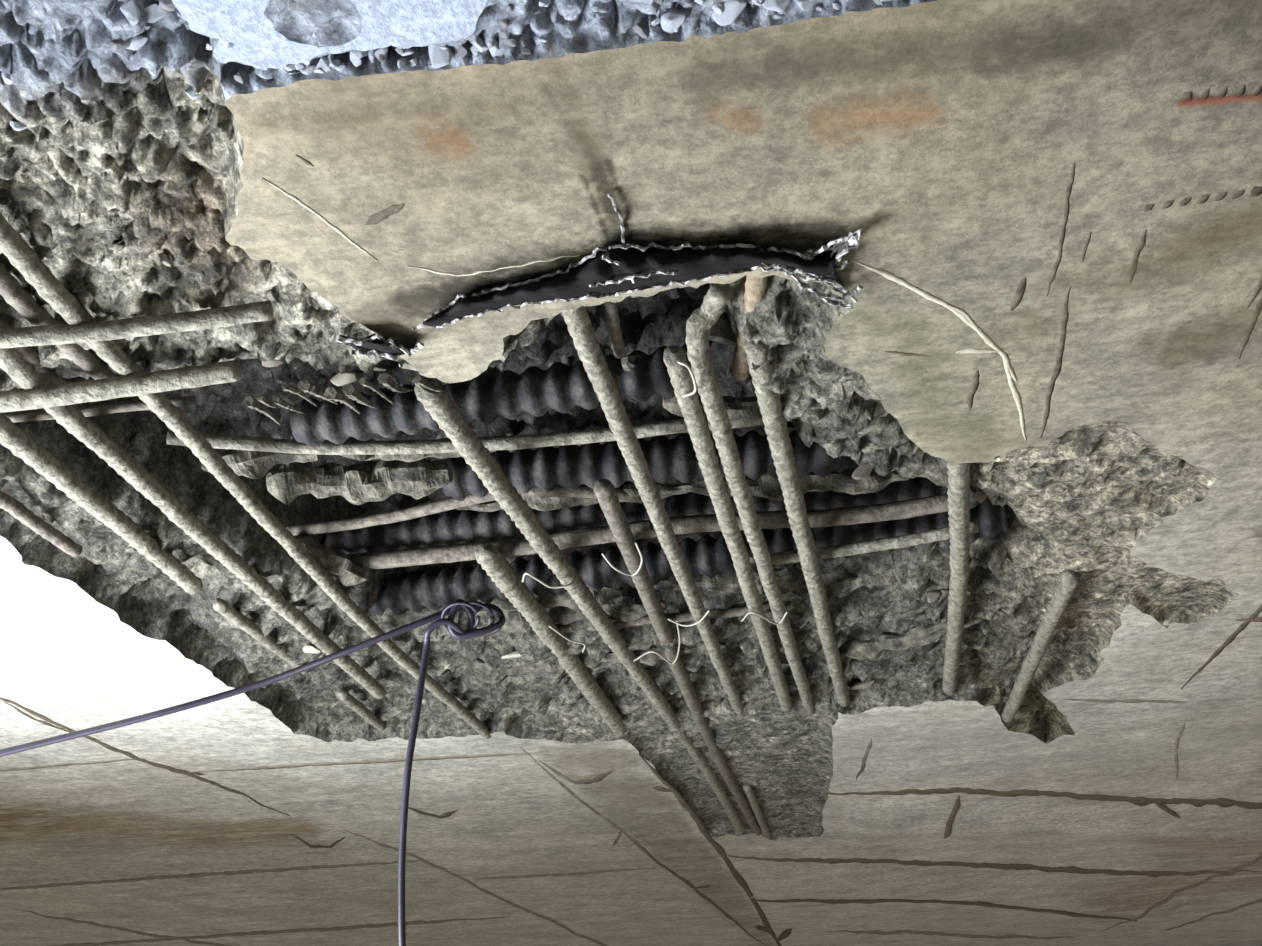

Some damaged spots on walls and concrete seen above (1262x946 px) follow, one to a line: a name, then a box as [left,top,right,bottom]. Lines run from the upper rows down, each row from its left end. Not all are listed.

rust [1178,83,1262,106]
spalling [0,0,938,688]
leakage [393,160,848,316]
crack [885,350,928,358]
crack [967,370,980,410]
crack [1010,164,1091,438]
crack [1129,230,1147,283]
crack [1239,271,1262,359]
spalling [346,275,1239,841]
spalling [245,610,499,742]
crack [0,697,609,946]
crack [520,722,1262,946]